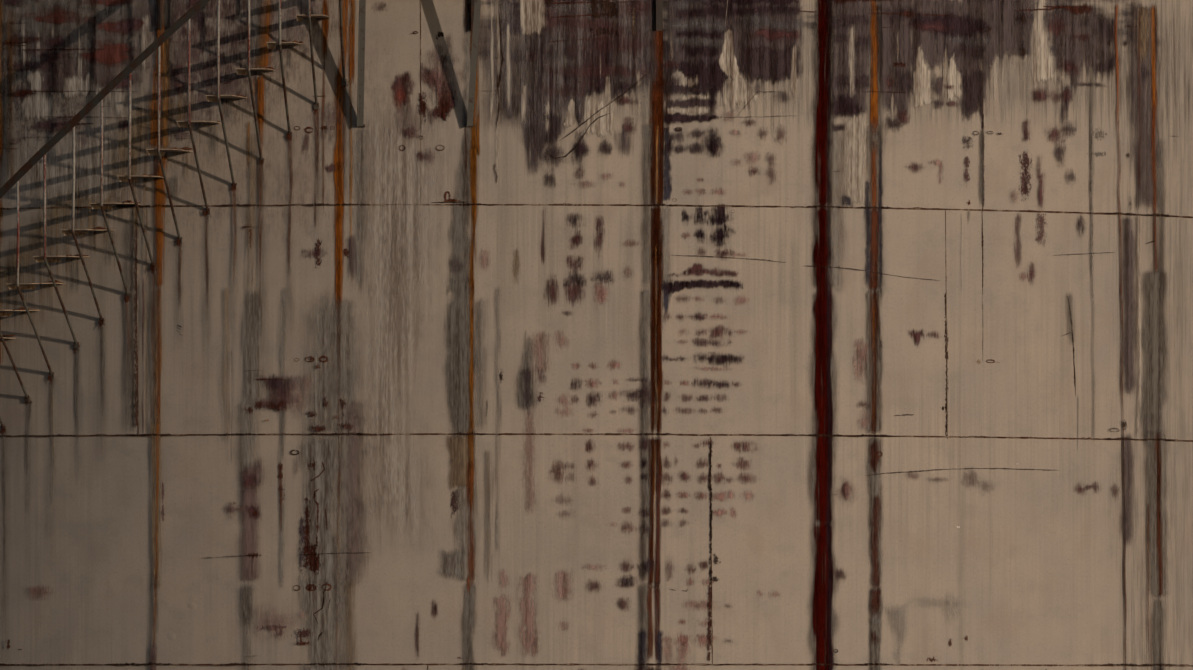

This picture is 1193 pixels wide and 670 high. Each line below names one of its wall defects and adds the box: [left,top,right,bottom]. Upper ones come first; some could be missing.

corrosion [0,0,196,670]
corrosion [217,0,370,368]
corrosion [392,38,455,138]
corrosion [450,0,534,590]
corrosion [549,285,580,300]
corrosion [561,0,939,670]
corrosion [299,387,423,670]